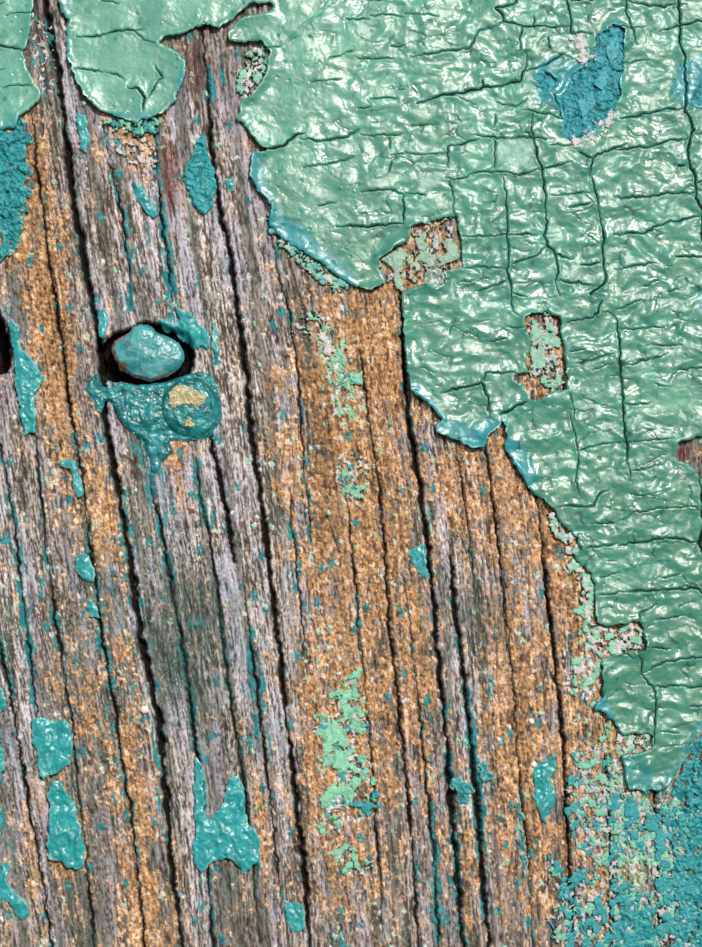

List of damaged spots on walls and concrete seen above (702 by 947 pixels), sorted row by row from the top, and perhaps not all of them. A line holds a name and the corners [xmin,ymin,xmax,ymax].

peeling [8,319,44,436]
crack [0,0,184,947]
crack [196,28,311,947]
peeling [378,217,460,292]
crack [267,0,702,947]
peeling [528,312,565,395]
crack [138,437,199,760]
peeling [547,504,644,707]
peeling [31,716,86,869]
peeling [192,757,261,874]
peeling [313,668,381,834]
peeling [532,730,702,947]